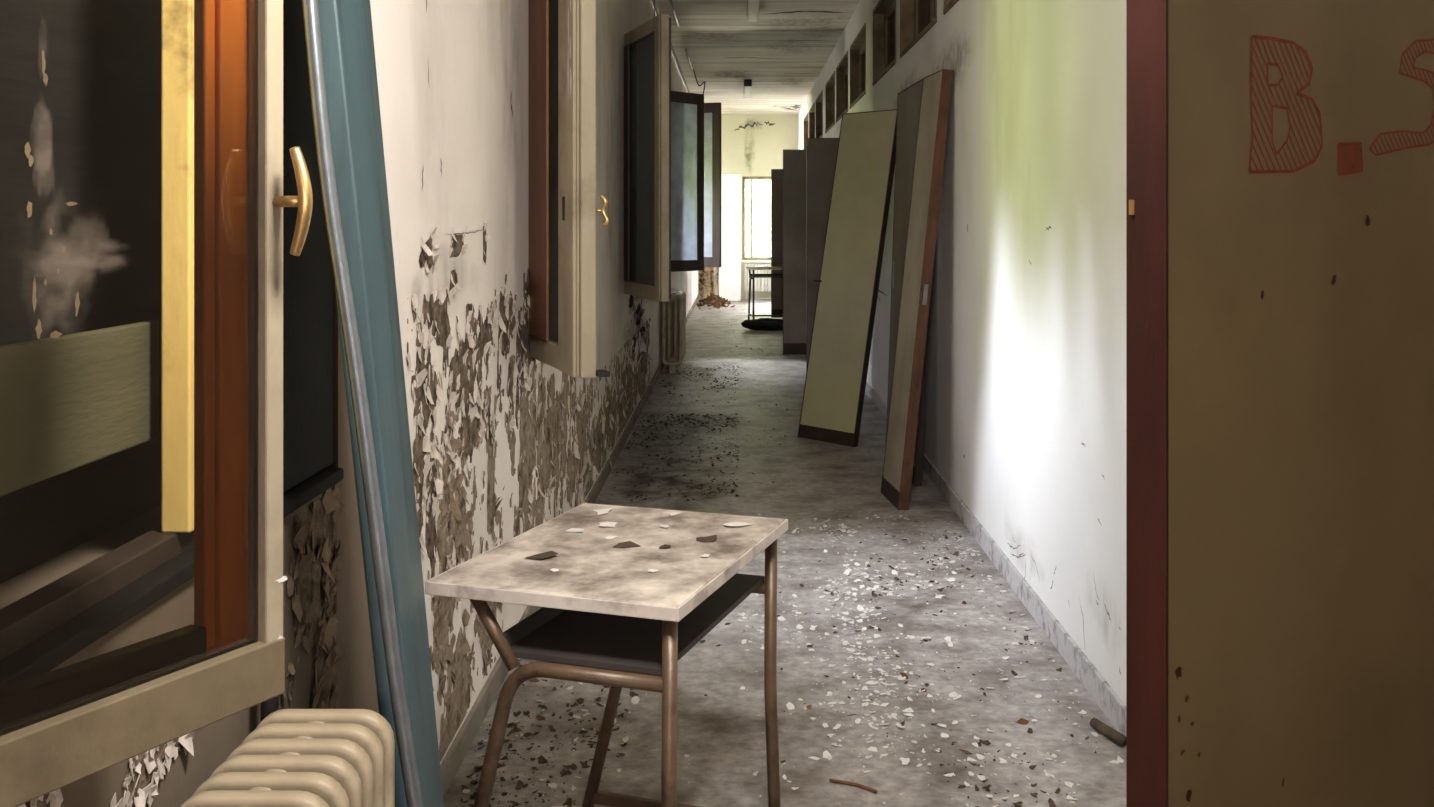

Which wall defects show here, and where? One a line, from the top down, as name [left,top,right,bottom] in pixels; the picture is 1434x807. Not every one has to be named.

peeling [407,220,652,761]
peeling [16,788,63,807]
peeling [110,731,196,807]